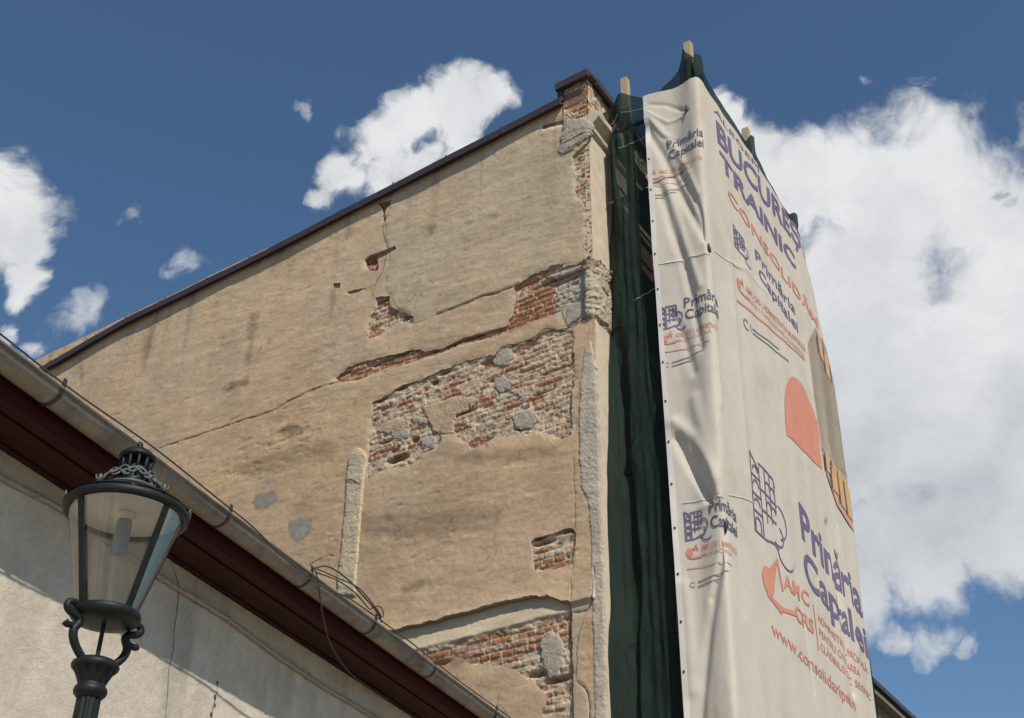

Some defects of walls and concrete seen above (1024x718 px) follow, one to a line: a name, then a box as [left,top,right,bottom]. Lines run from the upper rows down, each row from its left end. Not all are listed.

spalling [338,140,593,479]
spalling [532,529,576,573]
spalling [392,597,574,718]